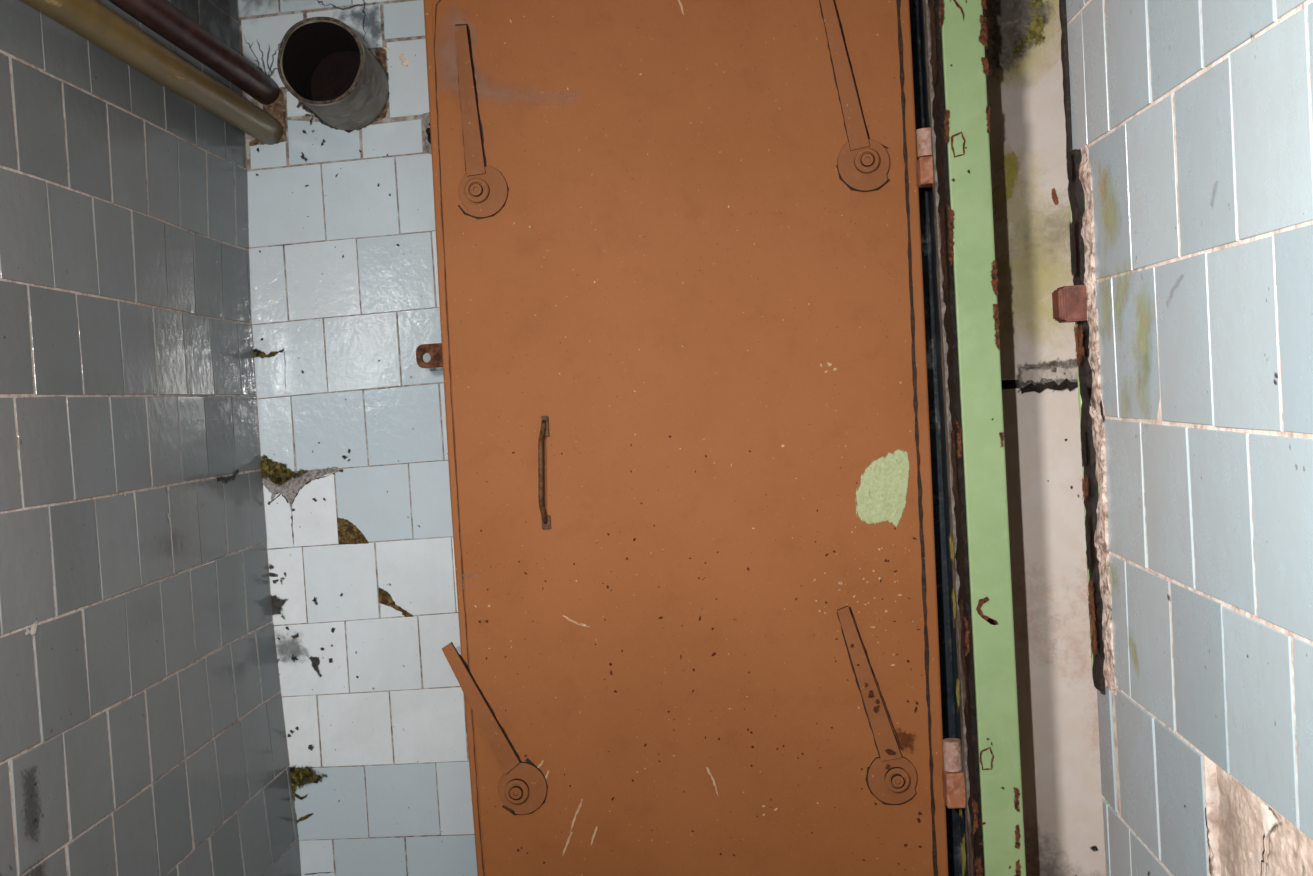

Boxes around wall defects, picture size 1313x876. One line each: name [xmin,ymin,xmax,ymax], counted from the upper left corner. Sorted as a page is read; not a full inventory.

crack [244,37,283,77]
crack [318,0,368,40]
damp [987,0,1053,71]
damp [994,152,1018,201]
spalling [1066,145,1118,695]
spalling [263,467,343,545]
spalling [337,517,369,545]
spalling [379,588,413,617]
flaking render [1205,765,1313,876]